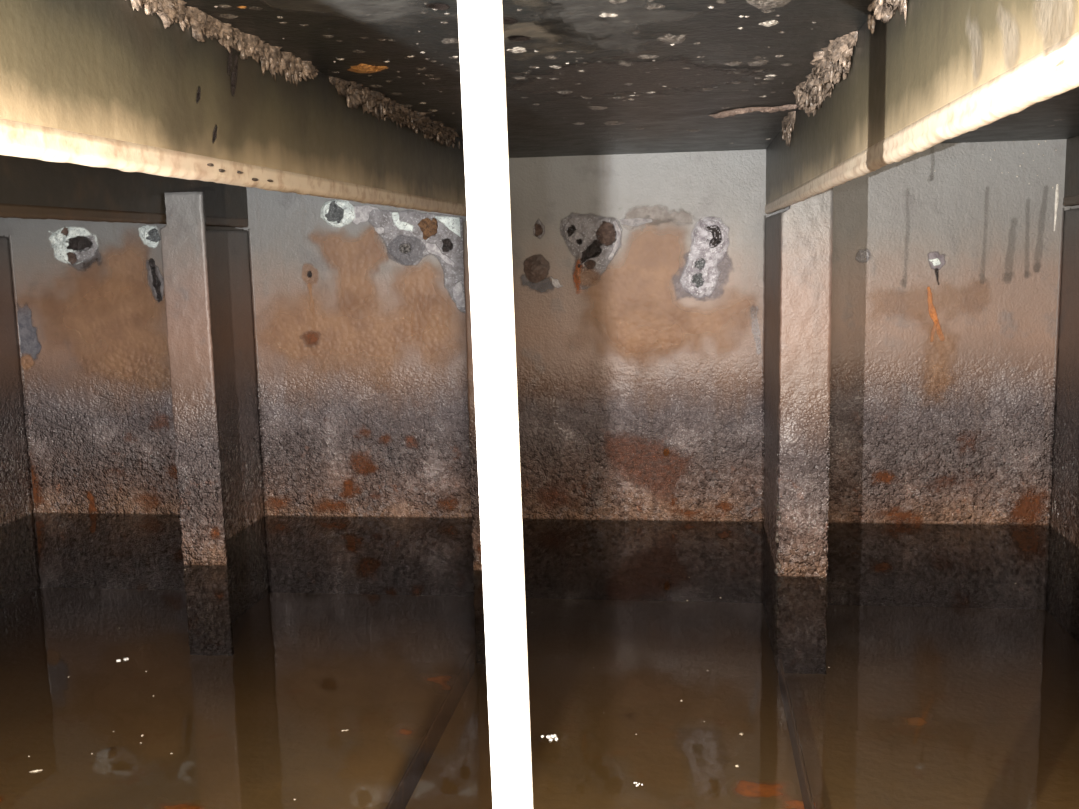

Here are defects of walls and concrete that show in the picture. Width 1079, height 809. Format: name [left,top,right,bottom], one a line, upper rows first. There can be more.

spalling [214,4,263,19]
corrosion [368,209,466,313]
corrosion [585,228,754,363]
corrosion [317,455,378,511]